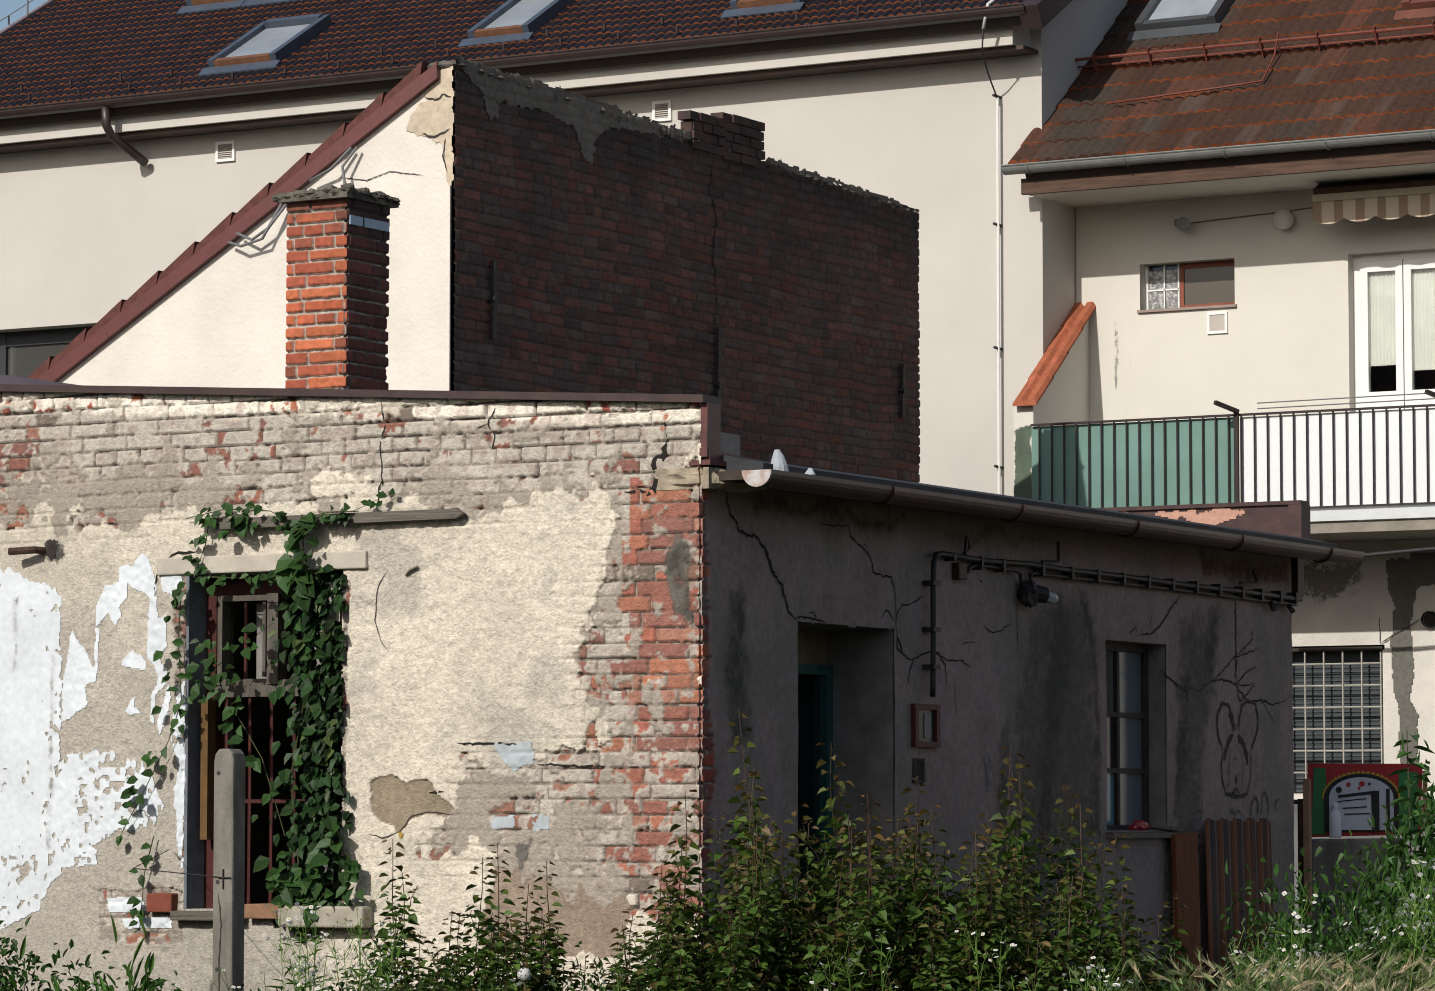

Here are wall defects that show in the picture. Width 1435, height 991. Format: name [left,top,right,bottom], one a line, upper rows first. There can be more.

peeling [1155,507,1245,525]
flaking render [0,392,718,959]
crack [822,524,1019,715]
water stain [985,599,1101,923]
crack [1130,595,1290,723]